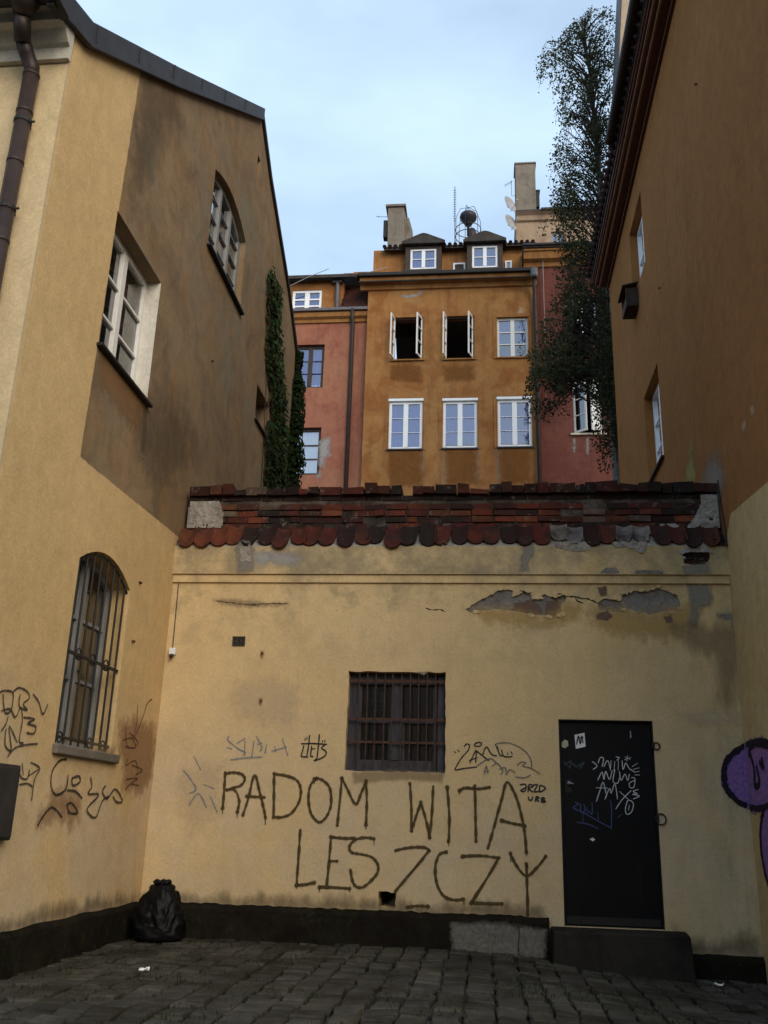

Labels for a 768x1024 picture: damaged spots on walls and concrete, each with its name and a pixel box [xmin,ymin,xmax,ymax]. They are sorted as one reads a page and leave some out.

flaking render [187,501,224,528]
flaking render [687,494,720,528]
flaking render [678,543,713,574]
crack [217,599,288,607]
flaking render [466,587,579,623]
water stain [687,584,713,626]